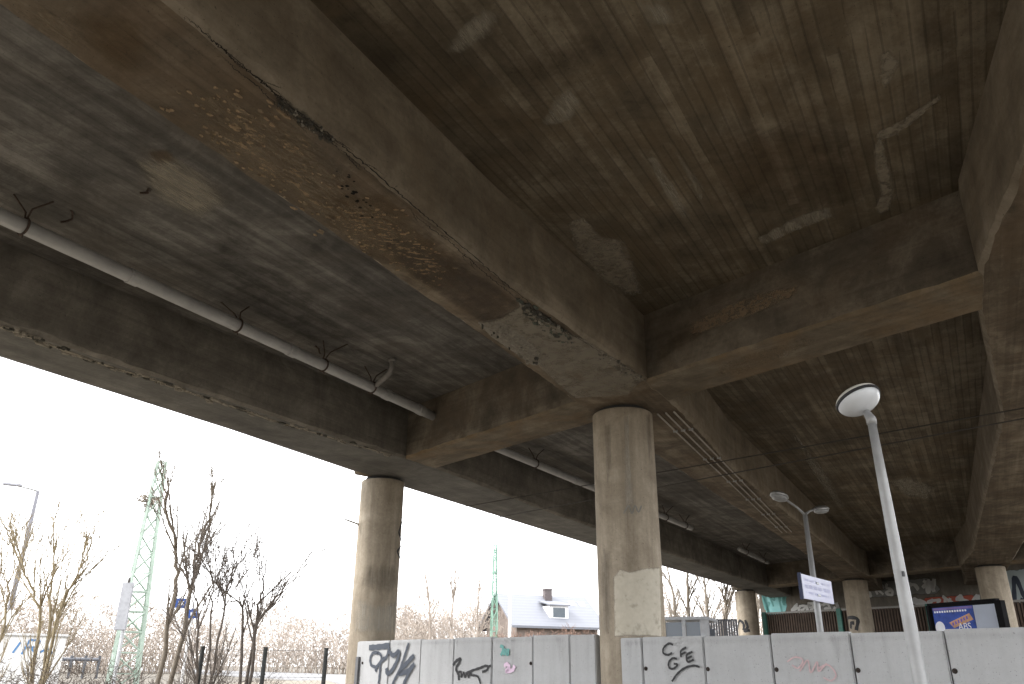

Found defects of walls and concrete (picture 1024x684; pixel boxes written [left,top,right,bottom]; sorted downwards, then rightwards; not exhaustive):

peeling [176,86,458,285]
crack [181,14,634,372]
spalling [516,298,573,344]